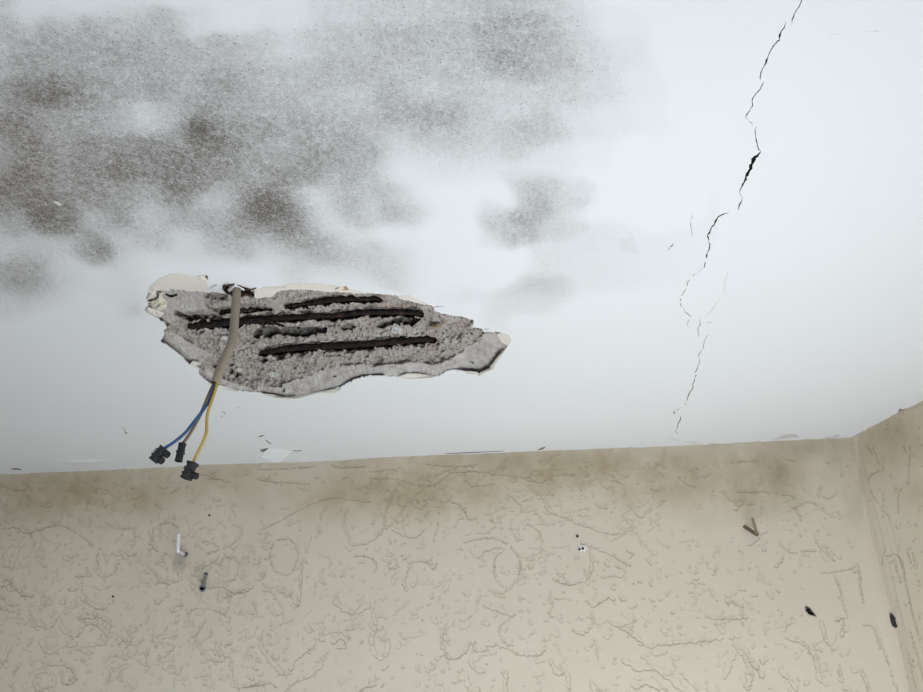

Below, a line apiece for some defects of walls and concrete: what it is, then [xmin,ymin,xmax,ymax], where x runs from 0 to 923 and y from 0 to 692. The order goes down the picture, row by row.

mould [0,2,470,268]
spalling [145,273,511,399]
crack [670,0,802,444]